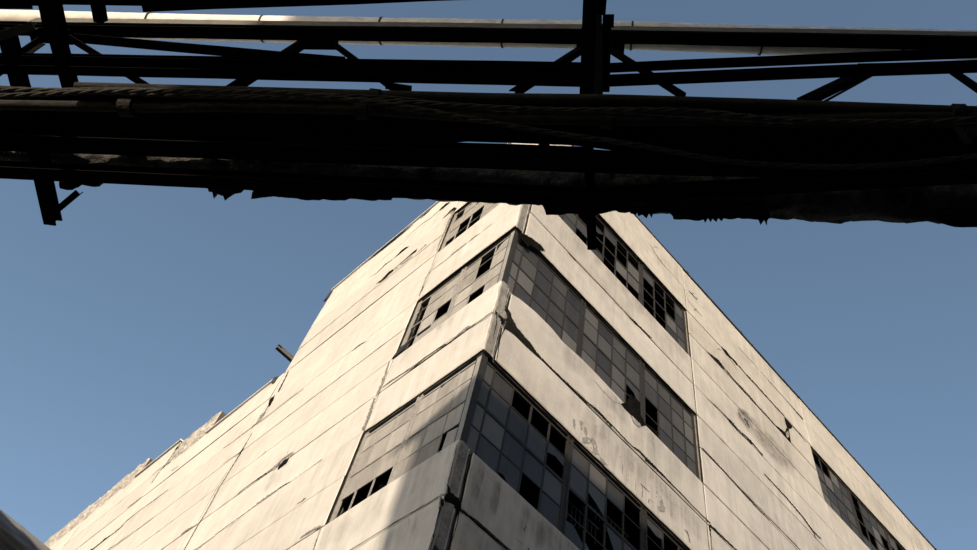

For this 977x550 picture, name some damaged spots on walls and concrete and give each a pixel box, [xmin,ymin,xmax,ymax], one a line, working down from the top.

spalling [775,417,805,442]
spalling [240,452,294,492]